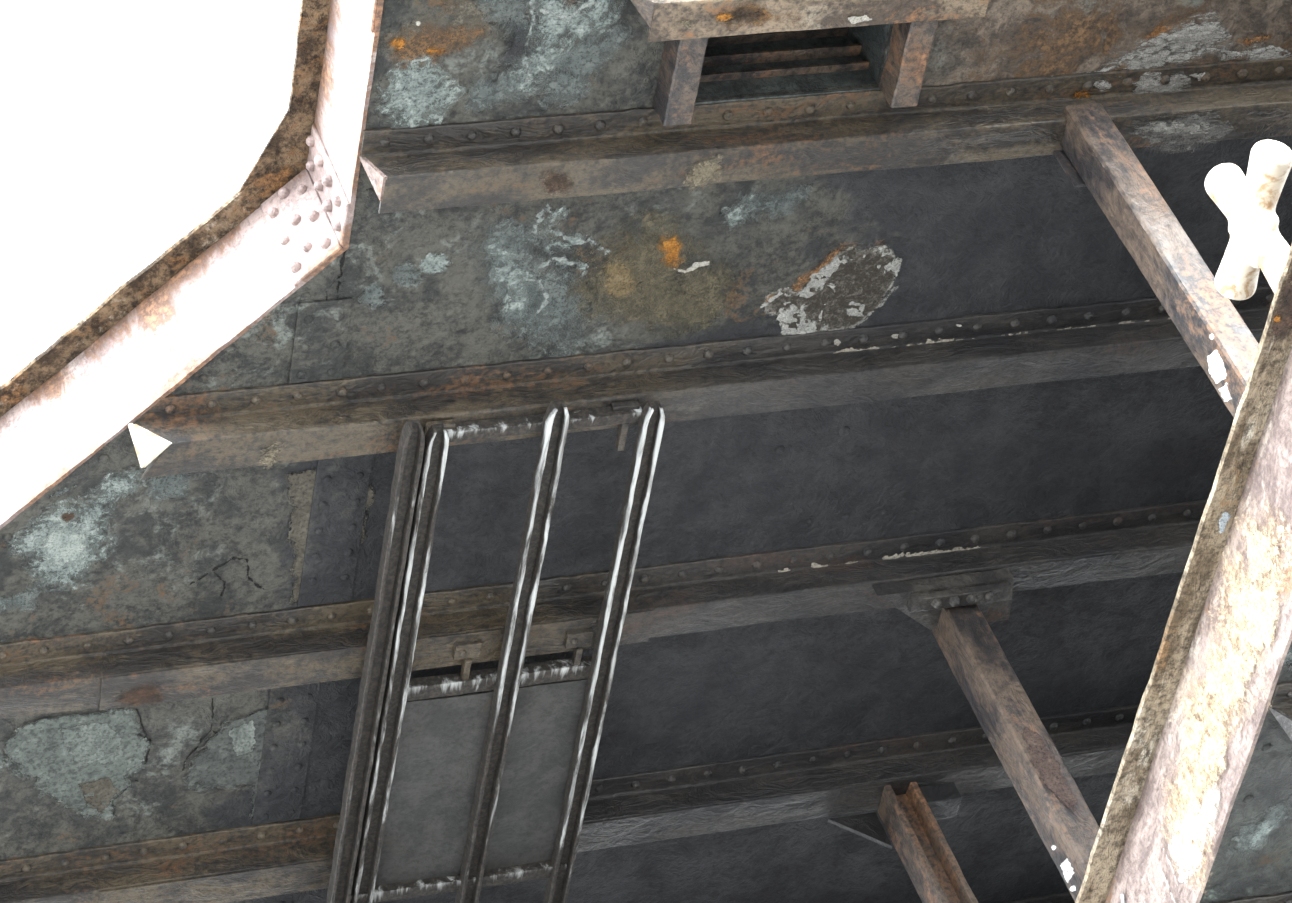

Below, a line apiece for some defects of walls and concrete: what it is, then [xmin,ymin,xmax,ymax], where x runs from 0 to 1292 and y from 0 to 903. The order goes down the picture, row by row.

corrosion [388,21,489,68]
water stain [380,0,630,128]
corrosion [566,211,734,334]
peeling [760,244,902,346]
crack [190,557,265,596]
crack [112,709,151,815]
crack [182,698,218,771]
corrosion [1161,501,1292,883]